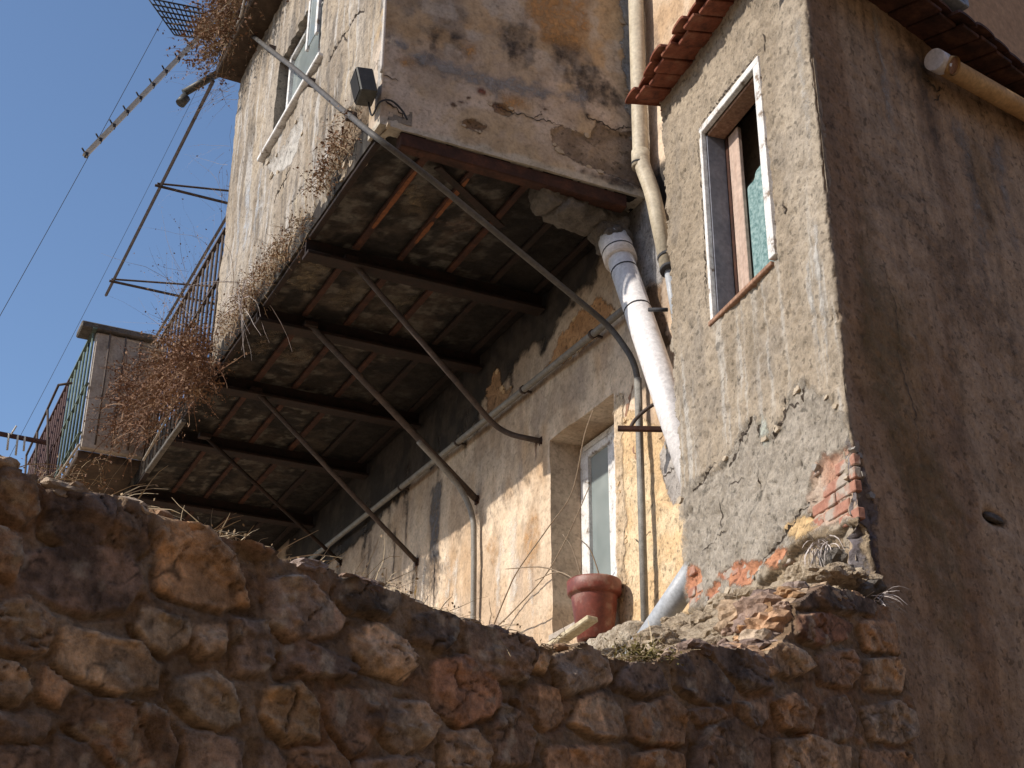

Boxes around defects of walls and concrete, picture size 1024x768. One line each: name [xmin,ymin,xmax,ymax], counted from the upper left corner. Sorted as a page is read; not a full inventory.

water stain [396,41,621,105]
crack [493,104,562,126]
flaking render [551,0,642,188]
crack [586,114,631,136]
peeling [545,297,615,368]
crack [693,383,805,554]
peeling [613,377,887,624]
crack [763,501,817,560]